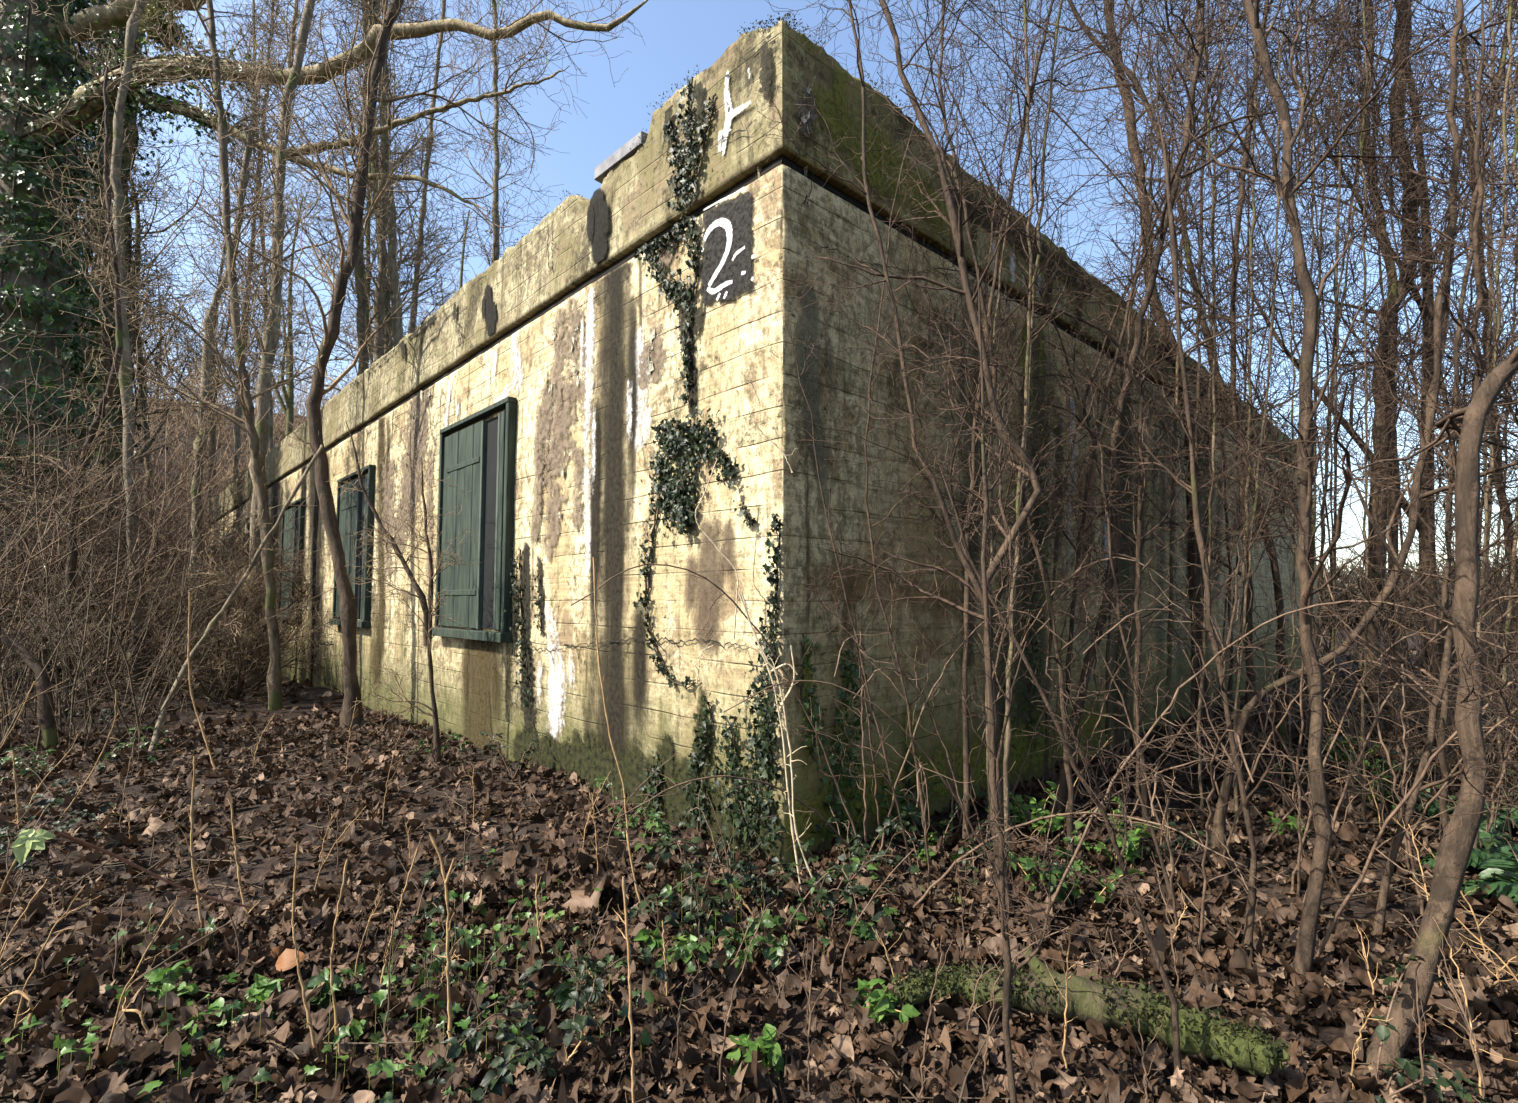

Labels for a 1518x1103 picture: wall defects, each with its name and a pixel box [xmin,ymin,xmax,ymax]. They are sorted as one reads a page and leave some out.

water stain [482,285,497,336]
water stain [492,332,523,401]
water stain [580,188,651,763]
water stain [462,542,574,752]